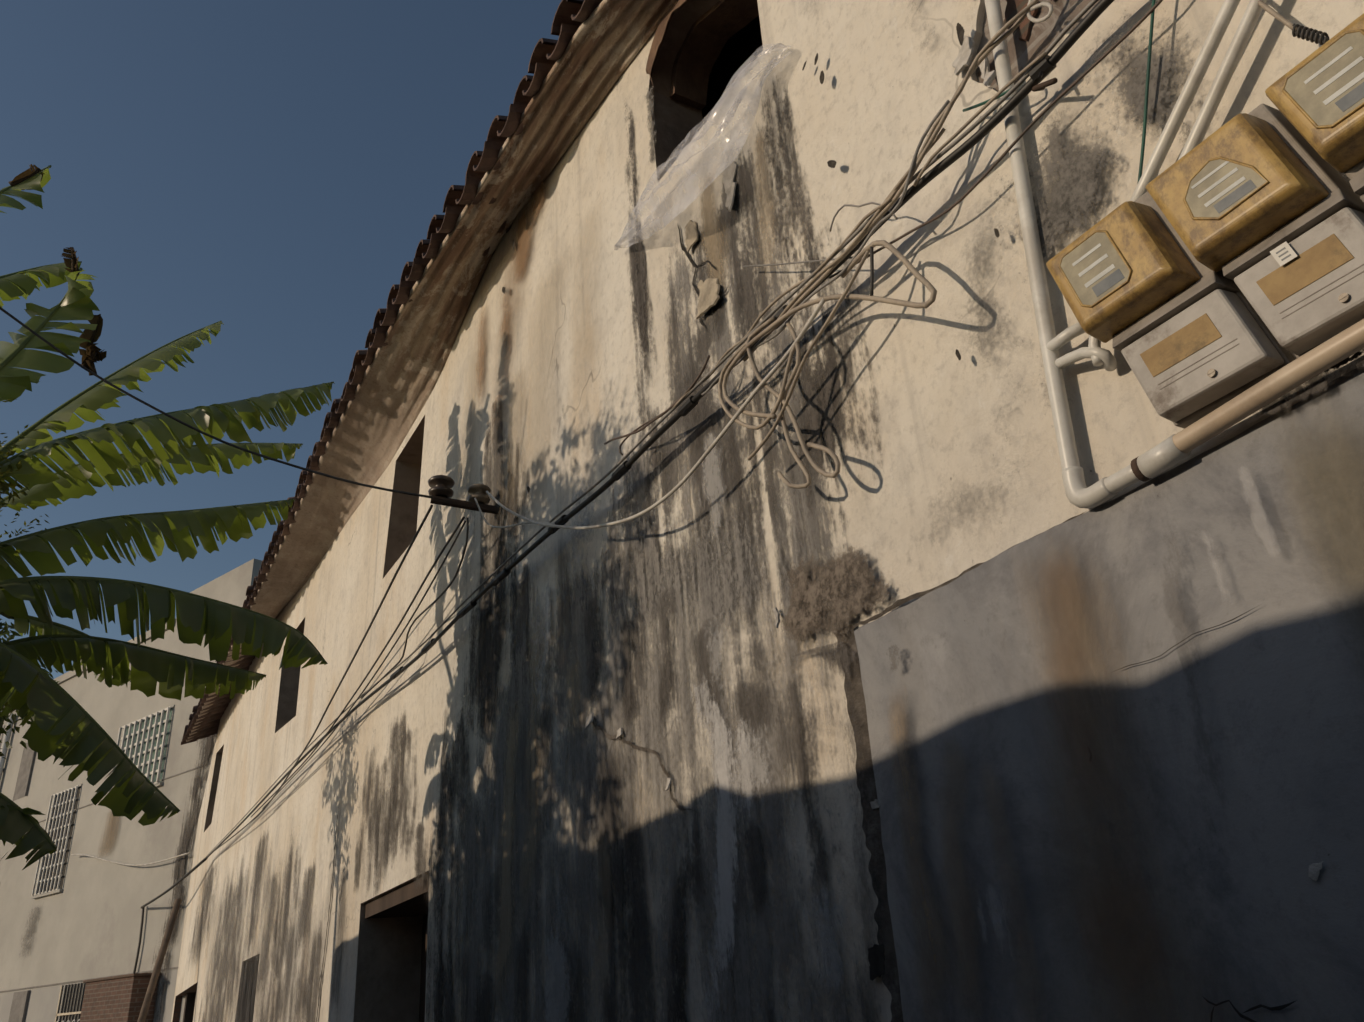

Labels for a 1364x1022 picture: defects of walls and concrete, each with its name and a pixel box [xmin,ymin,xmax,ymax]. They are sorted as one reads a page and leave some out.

flaking render [952,0,1100,91]
leakage [152,83,880,1022]
crack [1113,607,1256,672]